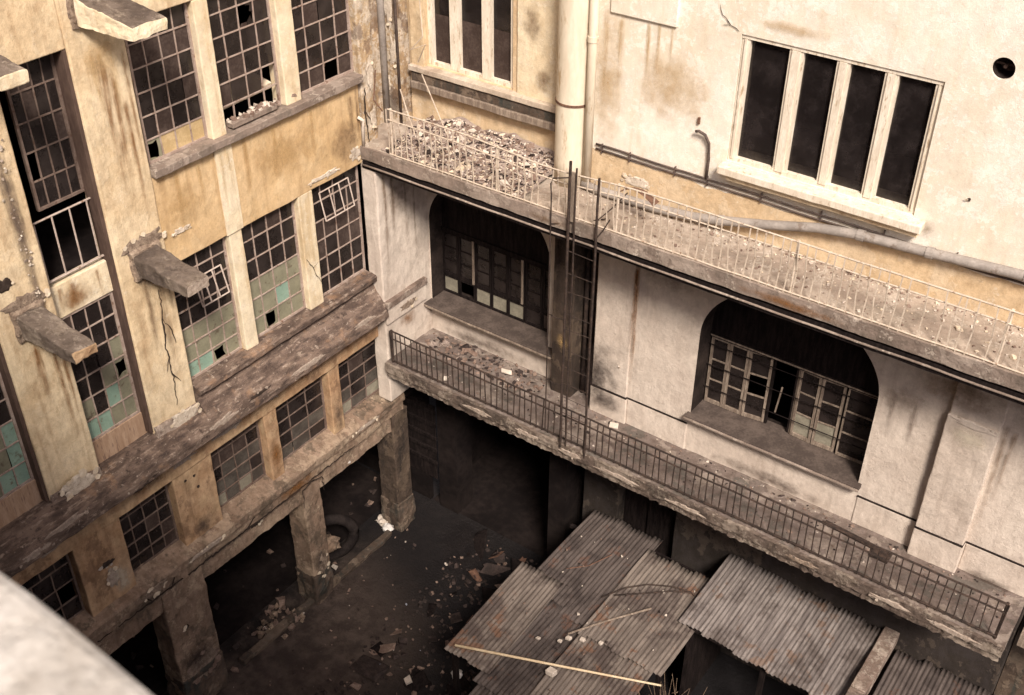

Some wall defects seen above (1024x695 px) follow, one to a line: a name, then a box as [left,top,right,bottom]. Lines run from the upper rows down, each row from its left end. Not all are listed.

flaking render [0,139,51,314]
flaking render [121,224,192,256]
crack [158,290,181,402]
spalling [170,403,202,428]
spalling [59,467,101,501]